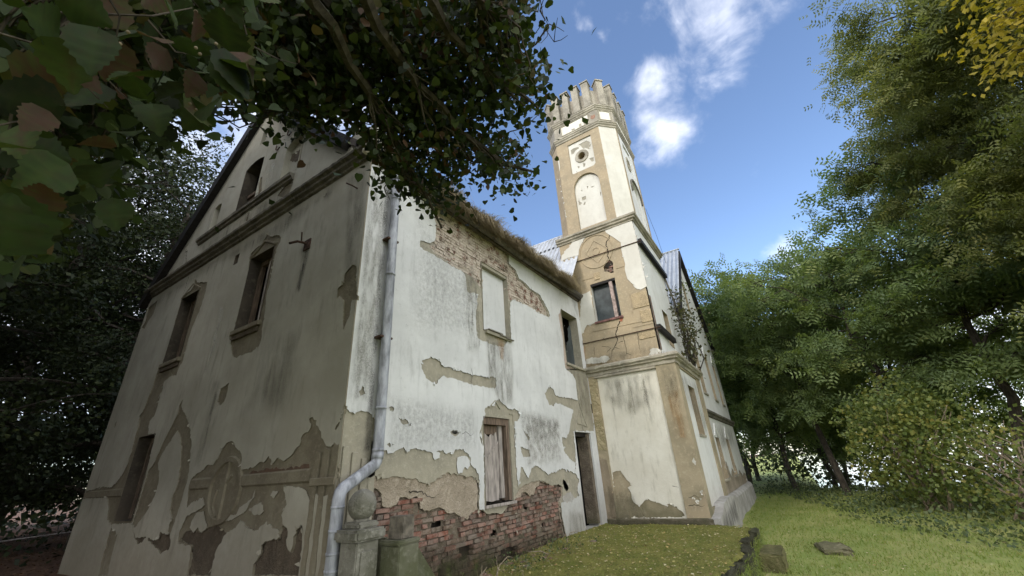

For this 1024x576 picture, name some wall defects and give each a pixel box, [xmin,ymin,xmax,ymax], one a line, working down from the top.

crack [604,235,614,272]
crack [594,318,639,362]
flaking render [86,206,661,576]
peeling [599,457,711,519]